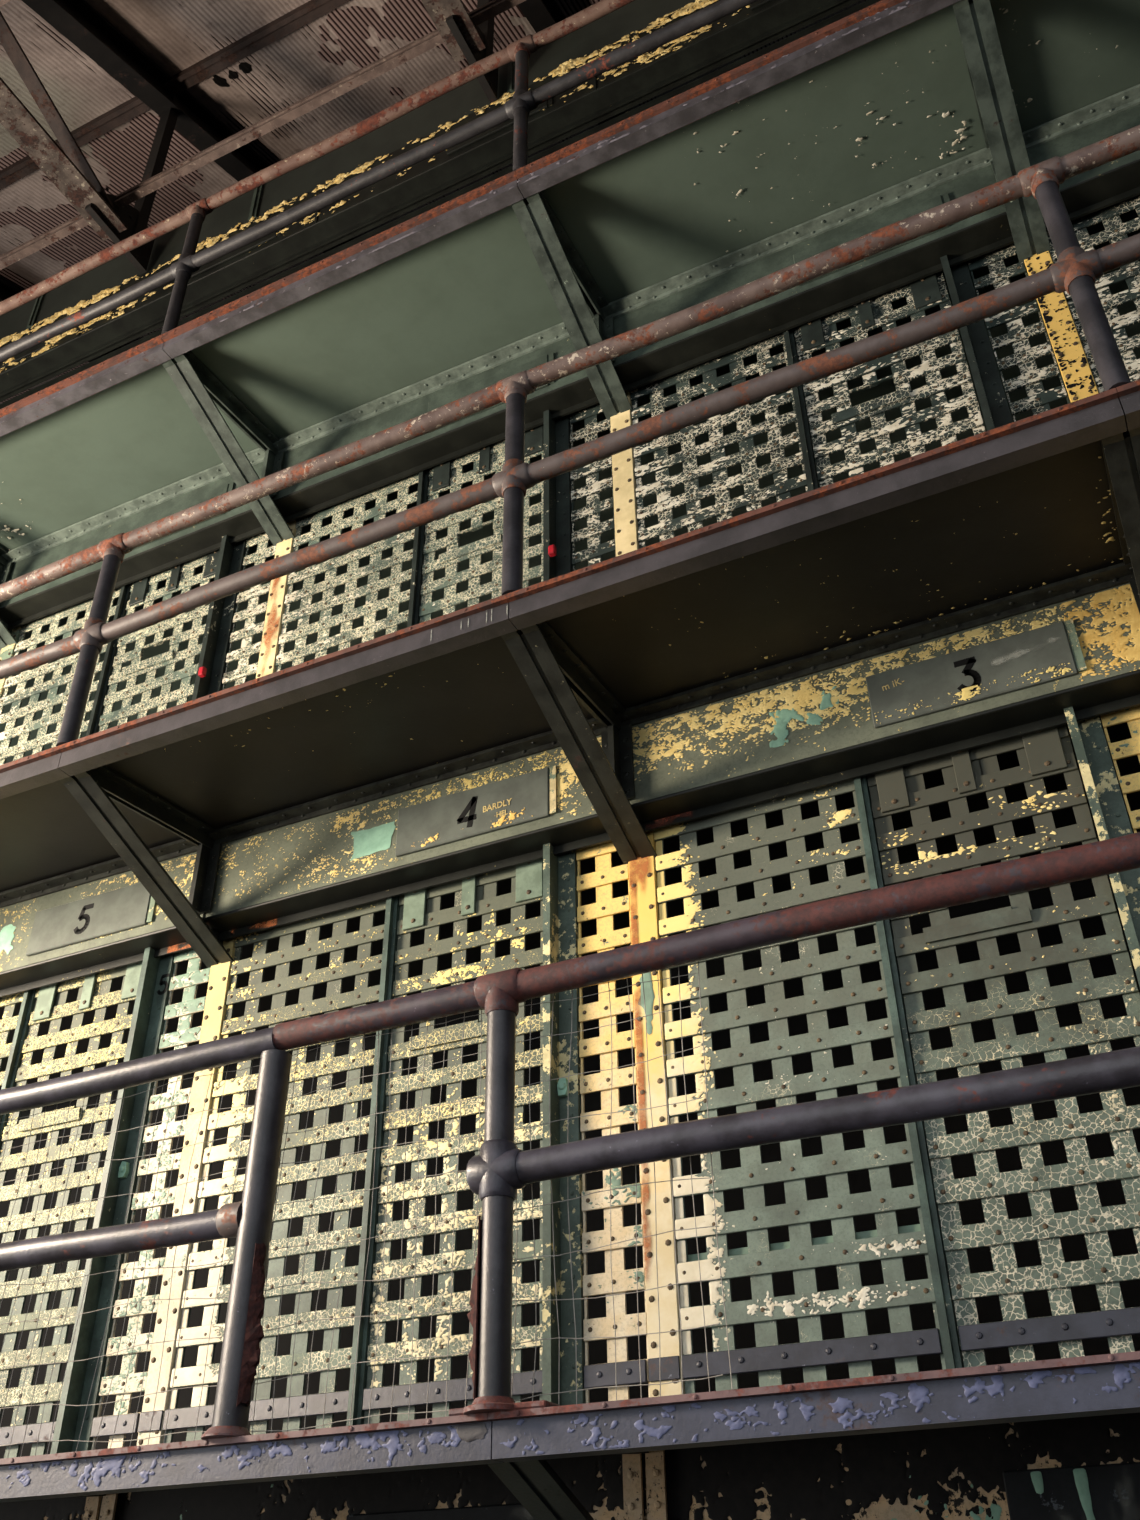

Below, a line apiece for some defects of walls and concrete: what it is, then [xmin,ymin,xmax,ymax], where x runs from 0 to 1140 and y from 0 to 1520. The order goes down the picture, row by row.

peeling [630,332,985,546]
corrosion [255,919,277,928]
corrosion [629,856,649,945]
peeling [197,1061,258,1212]
corrosion [635,990,646,1130]
peeling [662,964,722,1124]
peeling [169,1238,234,1409]
corrosion [236,1243,266,1407]
corrosion [467,1215,482,1400]
corrosion [642,1184,651,1275]
peeling [672,1153,735,1355]
peeling [0,1362,1140,1520]